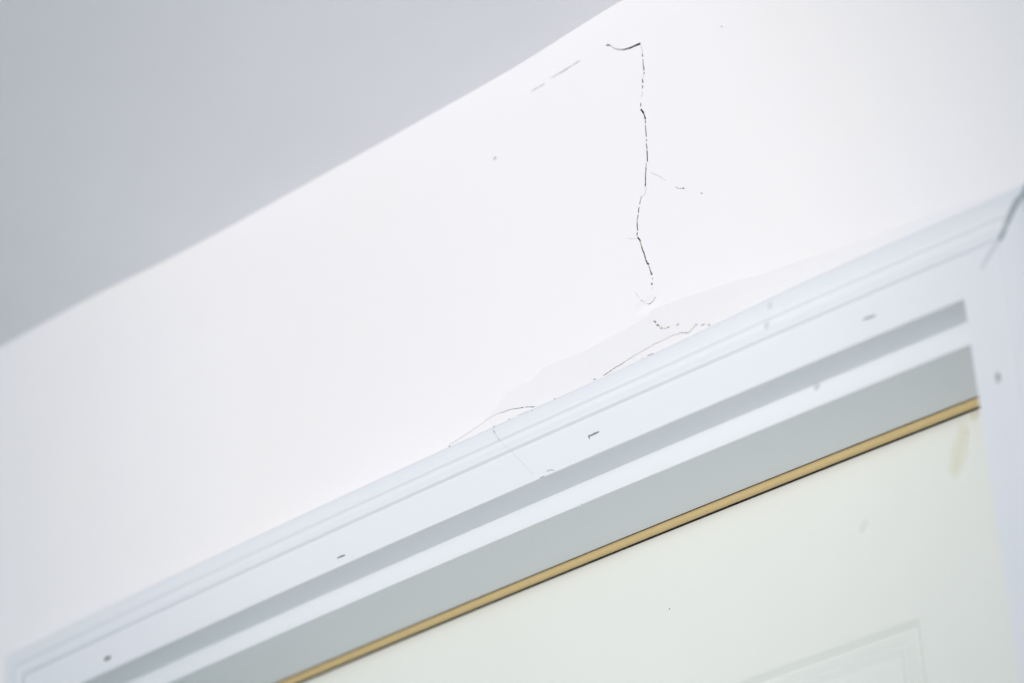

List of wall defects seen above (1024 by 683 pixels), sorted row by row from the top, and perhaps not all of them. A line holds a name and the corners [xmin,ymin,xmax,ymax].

crack [606,43,703,304]
crack [603,325,696,376]
crack [448,406,535,476]